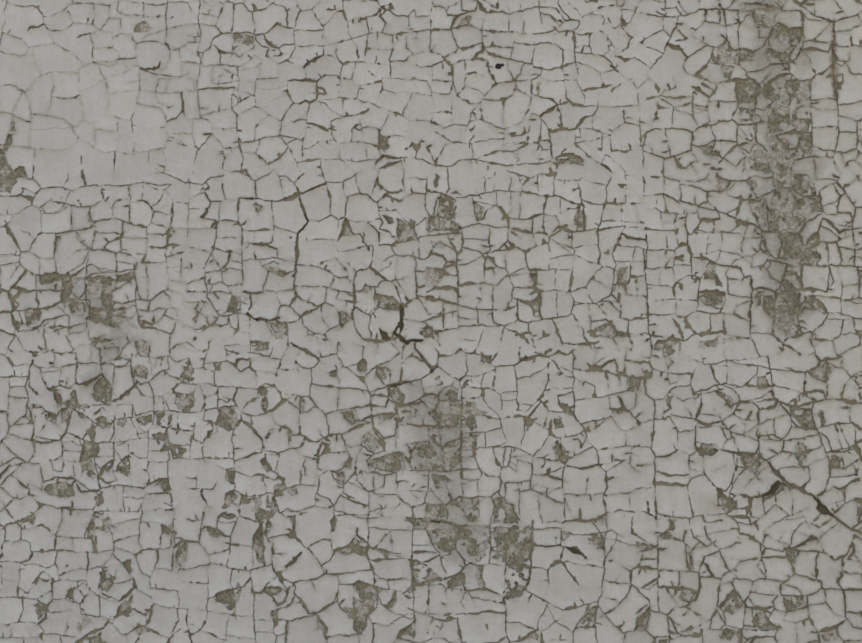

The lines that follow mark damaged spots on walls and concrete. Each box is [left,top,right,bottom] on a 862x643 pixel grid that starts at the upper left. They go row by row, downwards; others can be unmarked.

crack [0,0,181,132]
crack [132,0,210,52]
crack [585,0,637,30]
peeling [0,112,40,196]
crack [0,165,131,225]
crack [0,193,197,275]
crack [357,129,408,170]
peeling [669,0,862,450]
peeling [0,185,862,643]
crack [836,371,862,409]
crack [0,480,74,640]
crack [65,579,91,615]